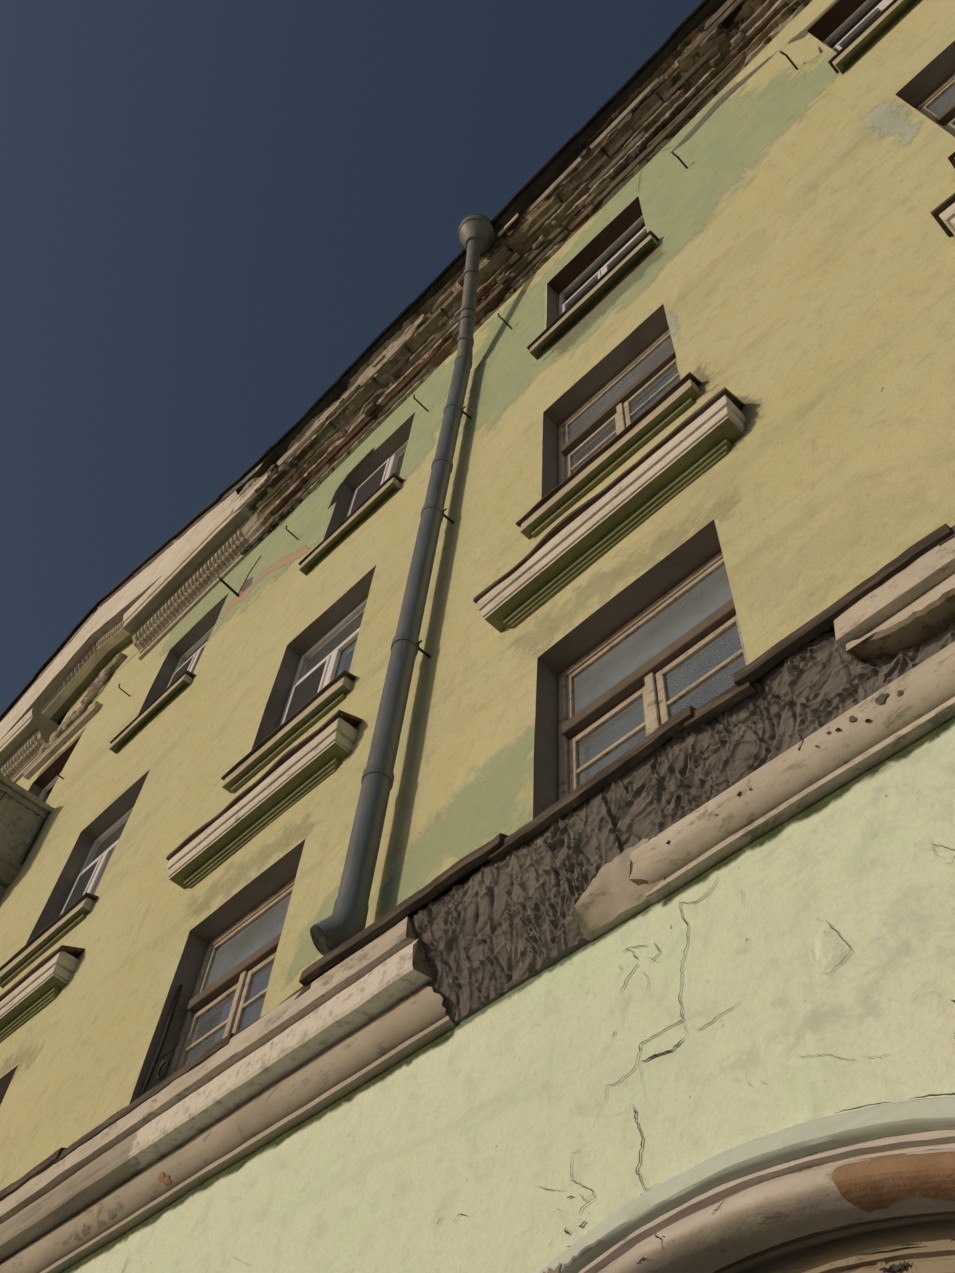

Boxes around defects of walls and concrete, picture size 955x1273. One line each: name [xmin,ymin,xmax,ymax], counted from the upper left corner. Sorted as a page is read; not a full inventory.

spalling [875,690,902,705]
crack [811,922,851,974]
crack [538,880,743,1247]
flaking render [832,1151,955,1212]